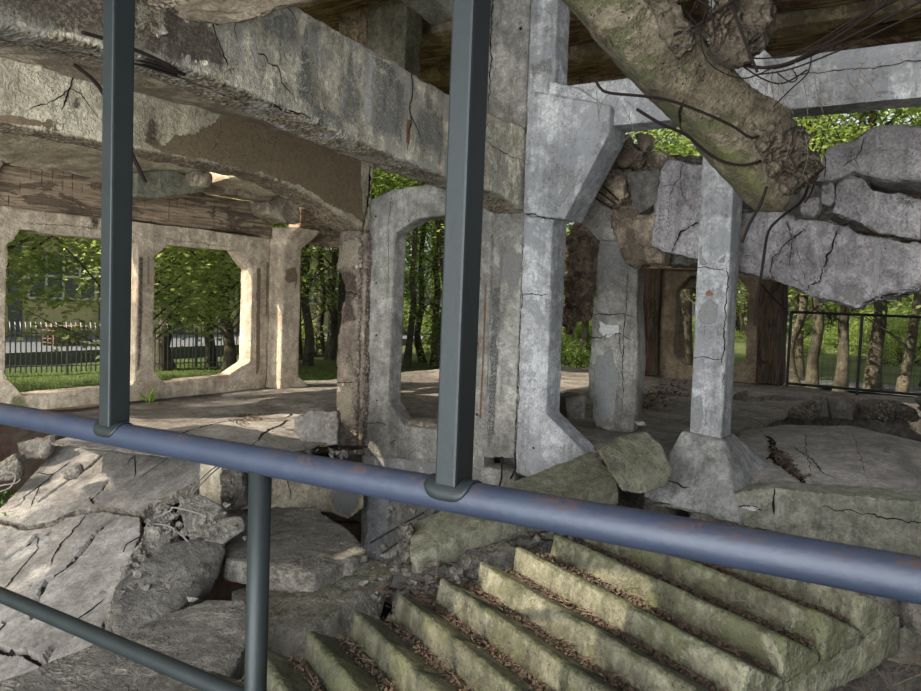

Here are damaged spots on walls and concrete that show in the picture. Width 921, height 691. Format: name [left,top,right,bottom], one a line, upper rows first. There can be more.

crack [27,78,102,120]
spalling [134,48,186,77]
spalling [135,0,305,73]
crack [169,53,326,126]
spalling [594,77,759,139]
spalling [636,108,761,167]
spalling [673,0,921,107]
crack [769,220,838,293]
crack [0,461,97,508]
crack [739,433,868,515]
crack [0,482,109,597]
crack [0,623,41,666]